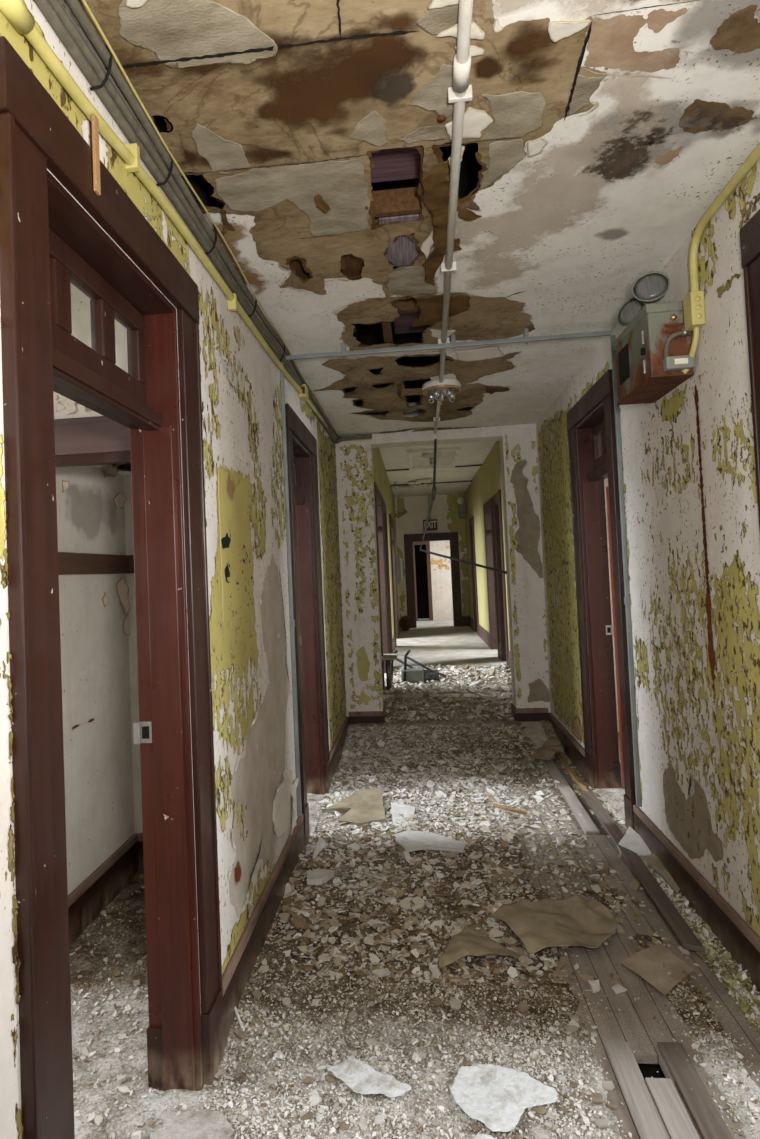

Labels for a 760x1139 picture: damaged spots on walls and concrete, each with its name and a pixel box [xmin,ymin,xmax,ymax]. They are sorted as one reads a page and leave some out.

peeling [0,11,89,135]
peeling [101,135,190,275]
leakage [184,151,209,165]
leakage [245,149,291,162]
leakage [177,14,426,133]
leakage [476,27,553,82]
leakage [583,103,745,182]
peeling [0,434,9,589]
flaking render [198,285,290,974]
peeling [300,402,383,748]
peeling [505,362,609,743]
peeling [621,372,760,937]